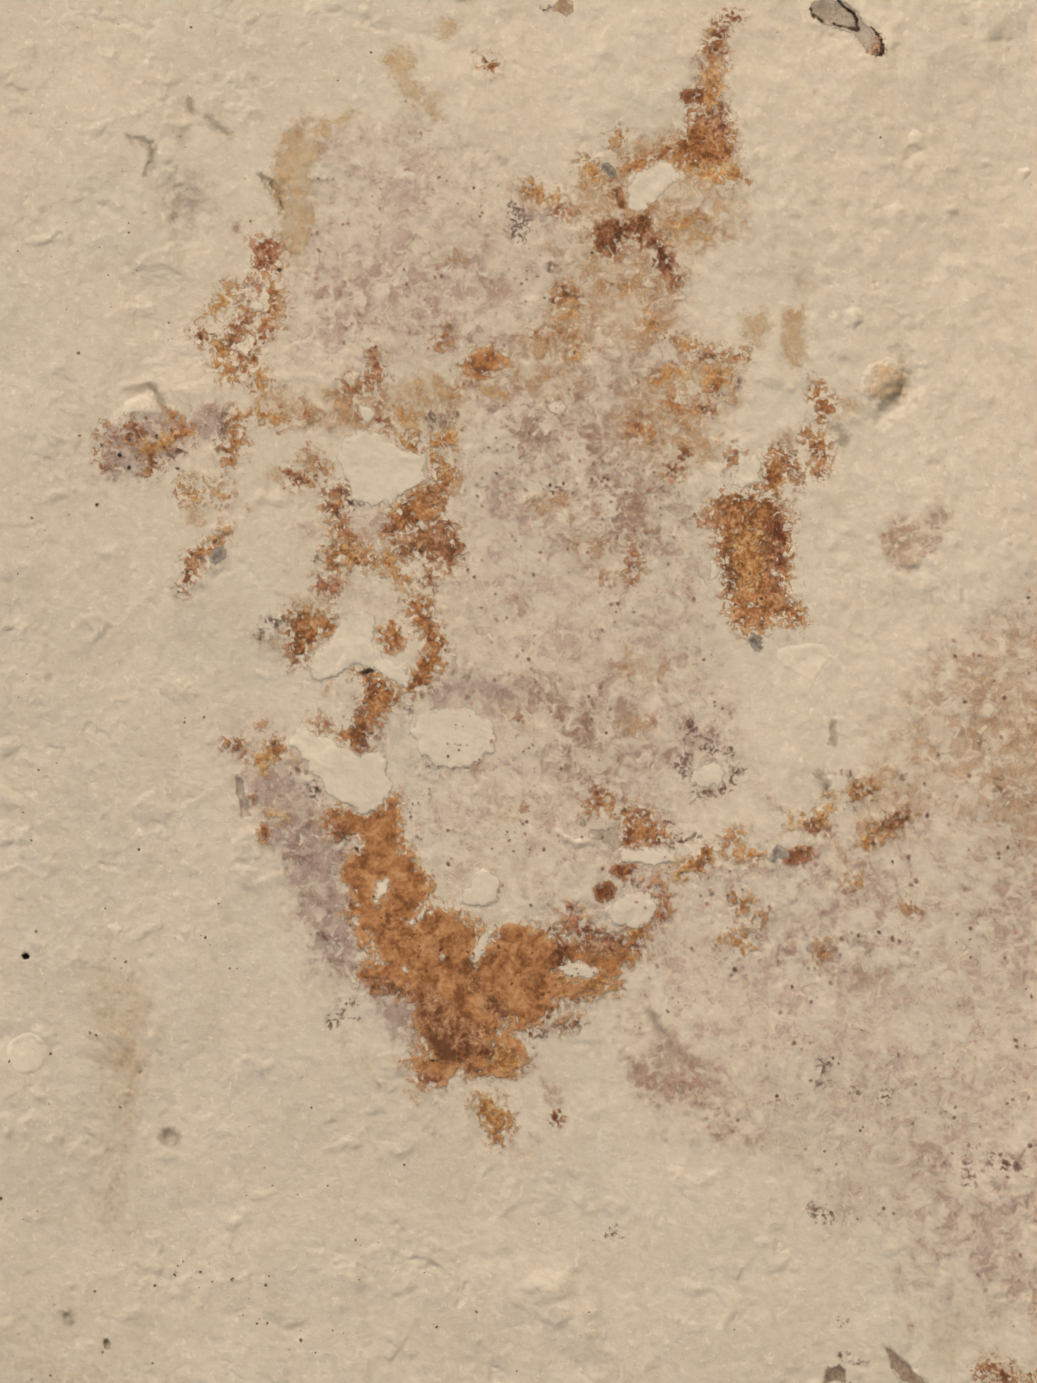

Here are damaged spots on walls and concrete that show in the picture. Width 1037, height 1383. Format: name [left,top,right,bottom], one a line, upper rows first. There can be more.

spalling [809,0,886,56]
corrosion [475,56,500,72]
corrosion [518,8,766,484]
corrosion [92,114,517,755]
corrosion [692,379,838,652]
corrosion [599,538,645,587]
corrosion [220,719,301,776]
corrosion [248,793,292,846]
corrosion [315,770,924,1148]
corrosion [970,1353,1037,1383]